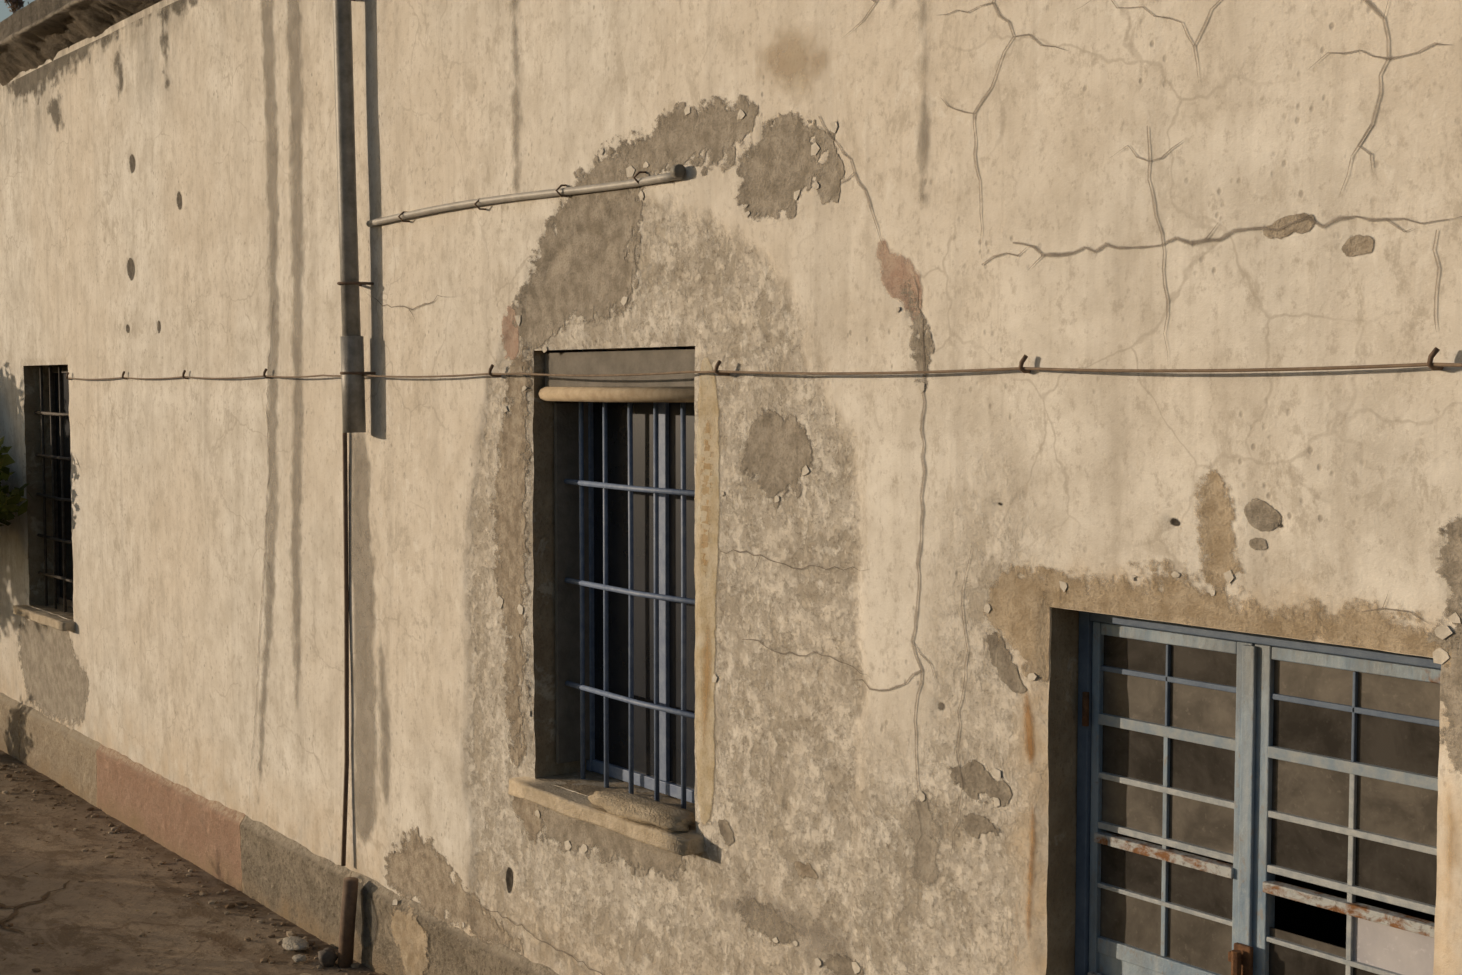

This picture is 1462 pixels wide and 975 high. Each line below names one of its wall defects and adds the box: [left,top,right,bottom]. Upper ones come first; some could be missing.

crack [818,116,886,249]
crack [941,0,1462,358]
spalling [490,94,845,768]
crack [721,276,972,865]
spalling [984,470,1462,774]
spalling [384,826,523,975]
spalling [512,796,695,882]
spalling [718,818,734,847]
spalling [794,861,818,879]
spalling [908,789,941,887]
spalling [949,759,1012,843]